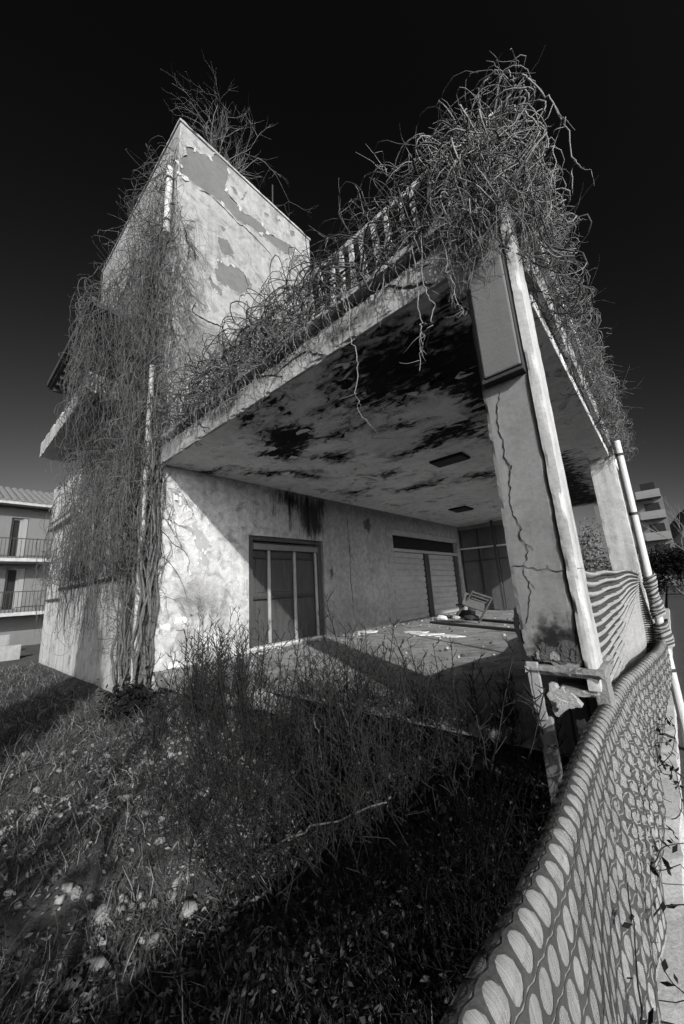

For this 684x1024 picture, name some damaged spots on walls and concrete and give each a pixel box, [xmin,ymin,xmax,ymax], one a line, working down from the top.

peeling [175,144,297,299]
leakage [214,273,488,497]
leakage [273,489,324,538]
crack [496,383,580,630]
leakage [561,449,597,507]